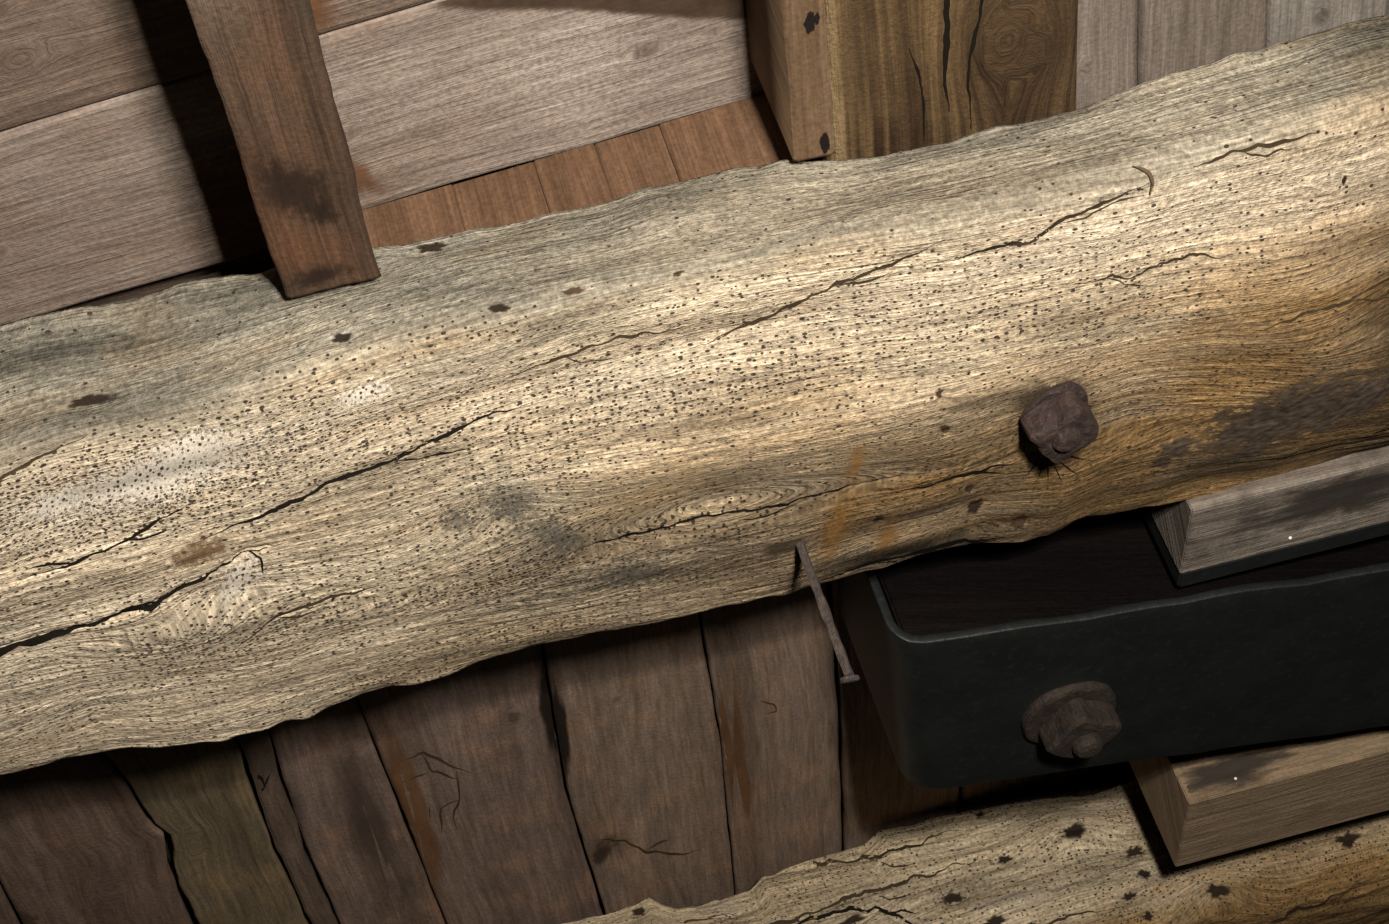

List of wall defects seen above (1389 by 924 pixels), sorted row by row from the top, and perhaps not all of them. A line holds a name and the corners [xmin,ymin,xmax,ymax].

crack [909,0,984,141]
crack [1193,131,1319,167]
damp [262,161,333,222]
crack [0,182,1150,657]
damp [1272,475,1389,521]
crack [593,839,698,855]
crack [769,830,983,924]
crack [684,912,737,924]
crack [1047,907,1120,924]
crack [1270,880,1369,924]